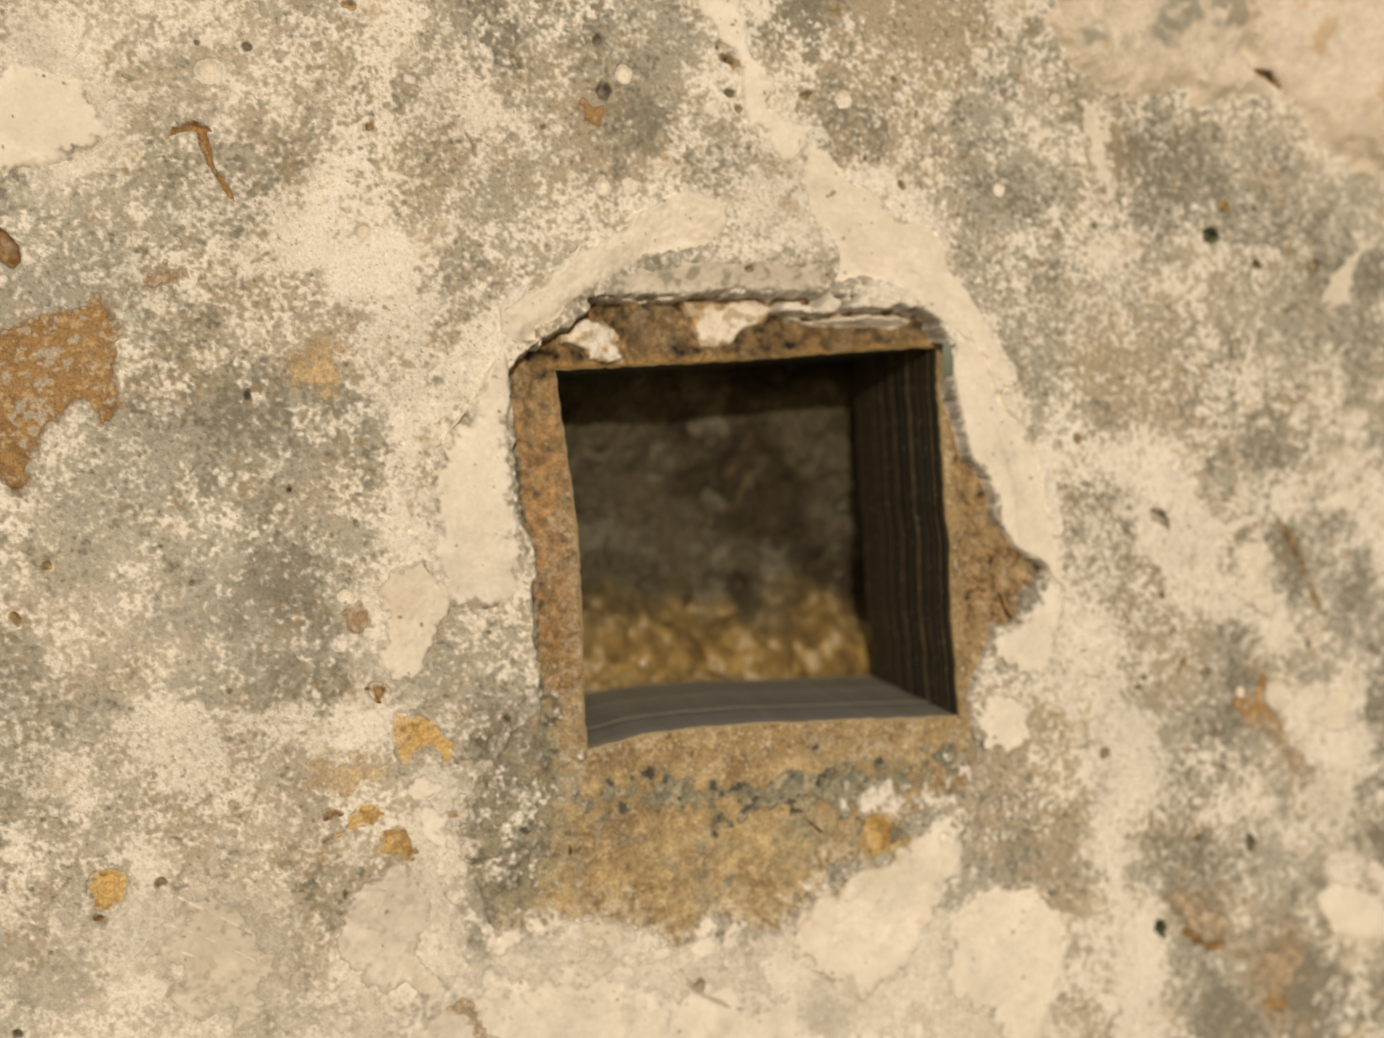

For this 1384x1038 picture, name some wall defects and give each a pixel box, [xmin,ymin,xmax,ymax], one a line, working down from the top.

crack [164,120,235,202]
spalling [0,227,21,269]
spalling [0,293,127,497]
spalling [364,142,1070,993]
spalling [87,868,128,926]